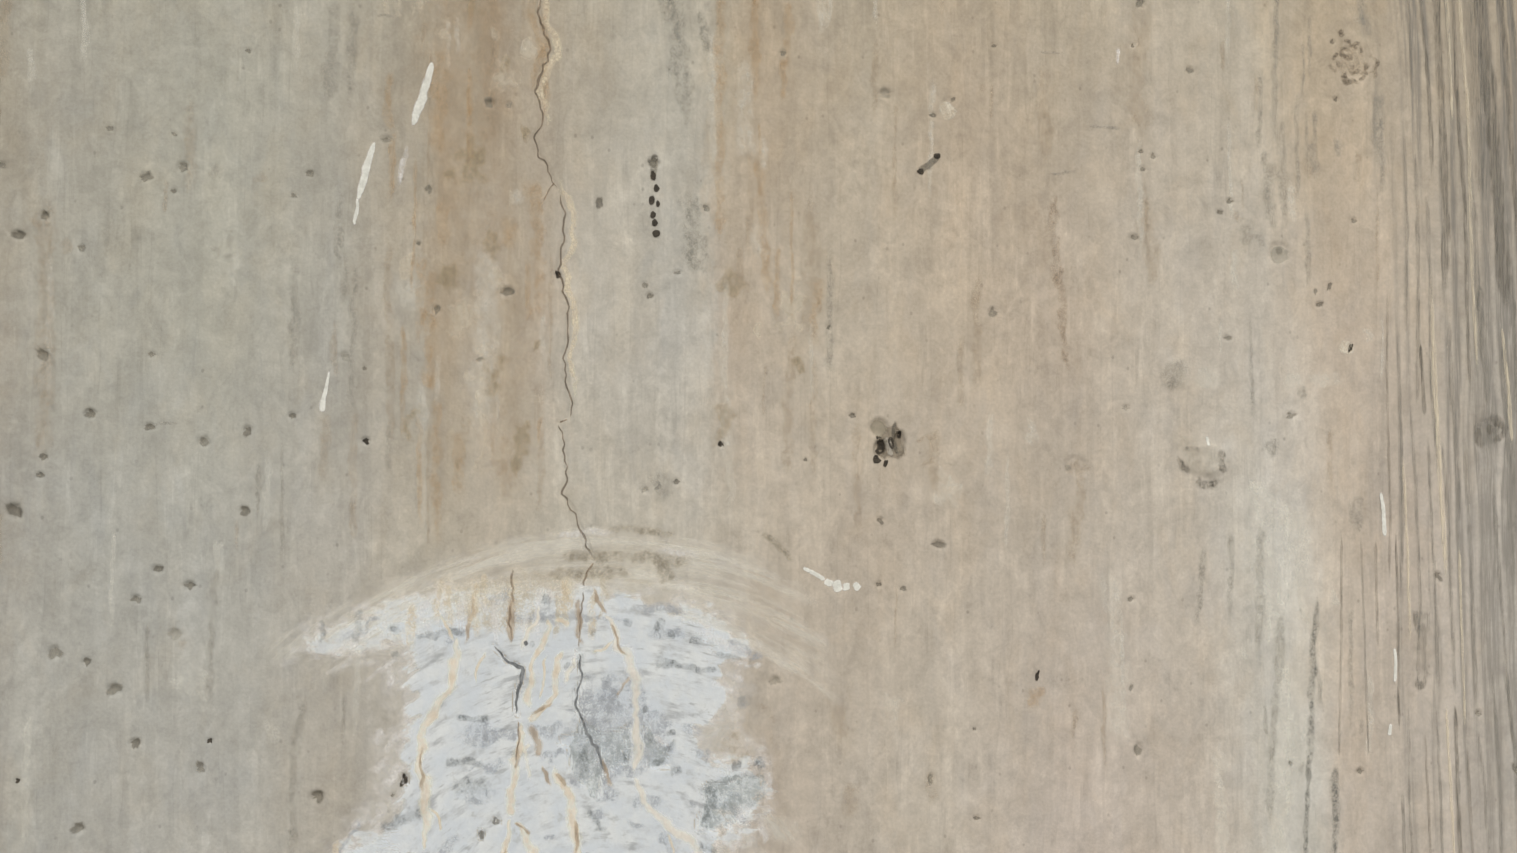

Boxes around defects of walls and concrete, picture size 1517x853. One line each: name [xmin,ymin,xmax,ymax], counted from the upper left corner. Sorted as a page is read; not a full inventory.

crack [533,0,603,769]
crack [495,572,528,759]
peeling [306,574,785,853]